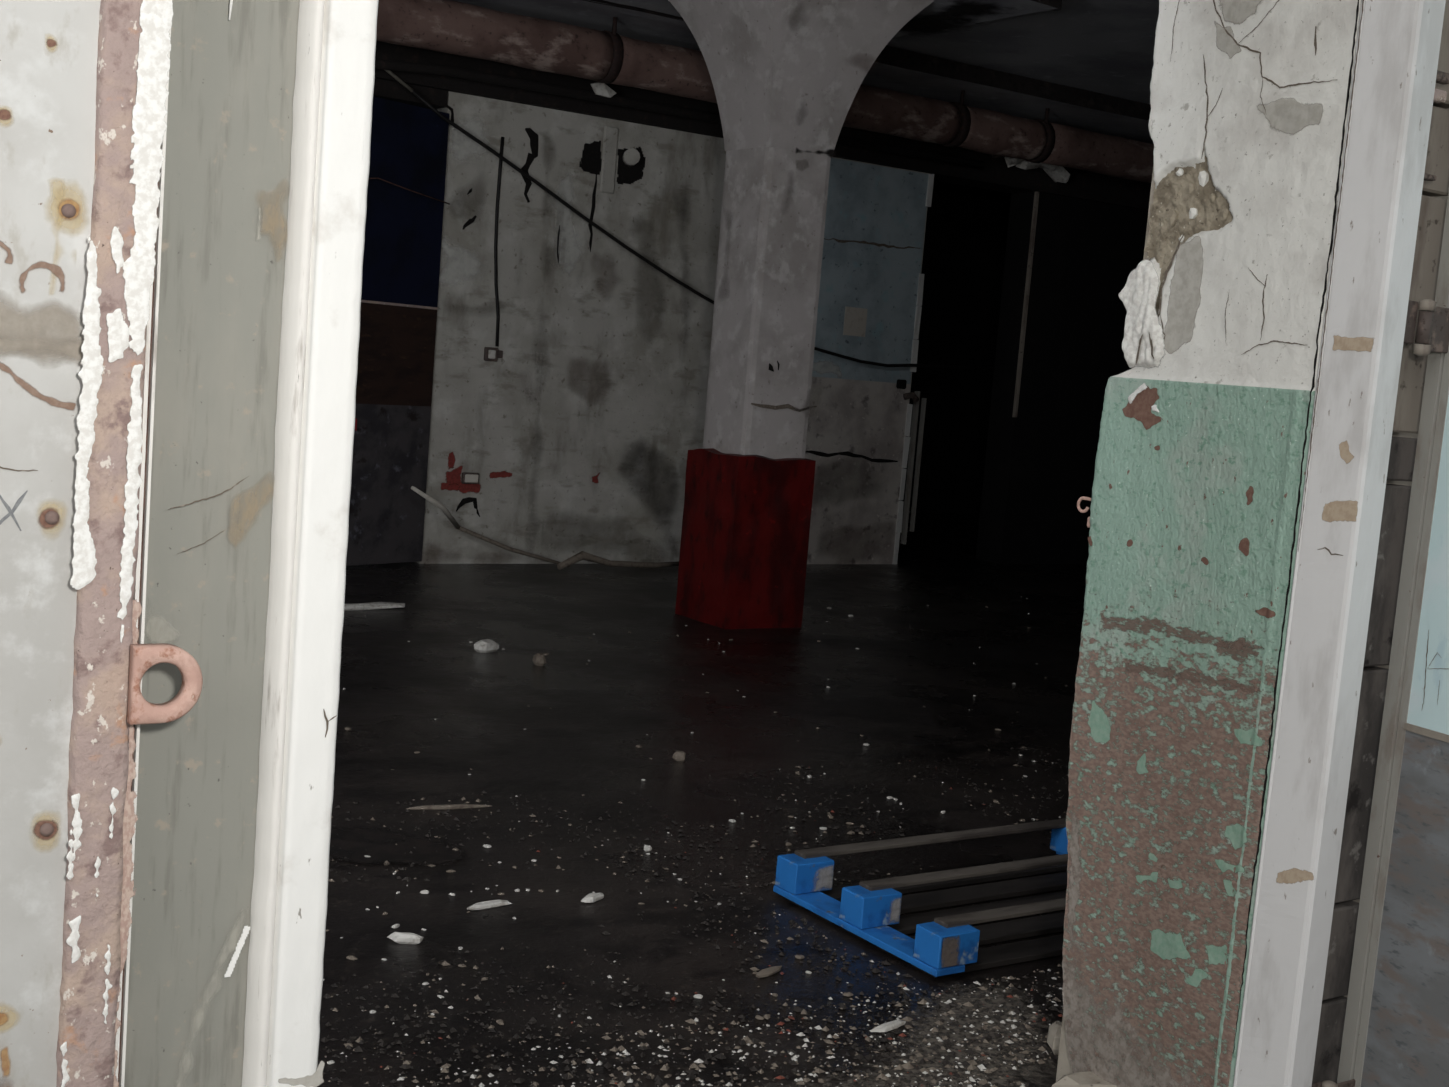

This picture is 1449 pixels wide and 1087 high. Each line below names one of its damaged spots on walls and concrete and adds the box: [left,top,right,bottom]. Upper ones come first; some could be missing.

peeling [1215,0,1261,58]
peeling [1258,98,1323,134]
crack [824,238,920,249]
flaking render [1144,156,1233,353]
crack [1158,234,1184,339]
crack [806,450,898,463]
rust [39,506,59,528]
crack [1170,0,1364,1054]
peeling [1062,606,1277,1087]
rust [1,1048,10,1087]